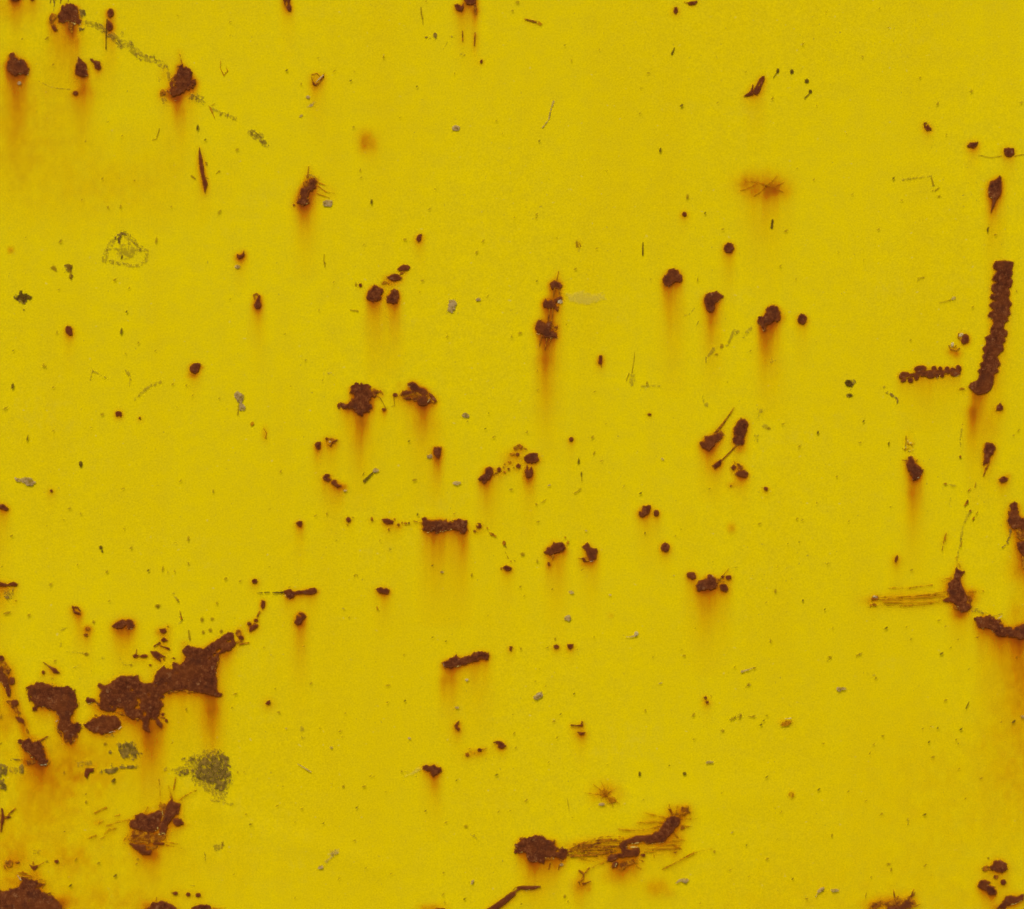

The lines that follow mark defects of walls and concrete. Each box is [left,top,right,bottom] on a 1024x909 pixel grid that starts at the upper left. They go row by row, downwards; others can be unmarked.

corrosion [160,60,197,113]
corrosion [337,382,437,441]
corrosion [534,271,563,375]
corrosion [700,408,749,487]
corrosion [899,365,961,382]
corrosion [960,260,1014,430]
corrosion [371,517,515,573]
corrosion [870,567,1024,664]
corrosion [0,579,317,788]
corrosion [0,860,67,909]
corrosion [95,778,188,862]
corrosion [487,807,693,909]